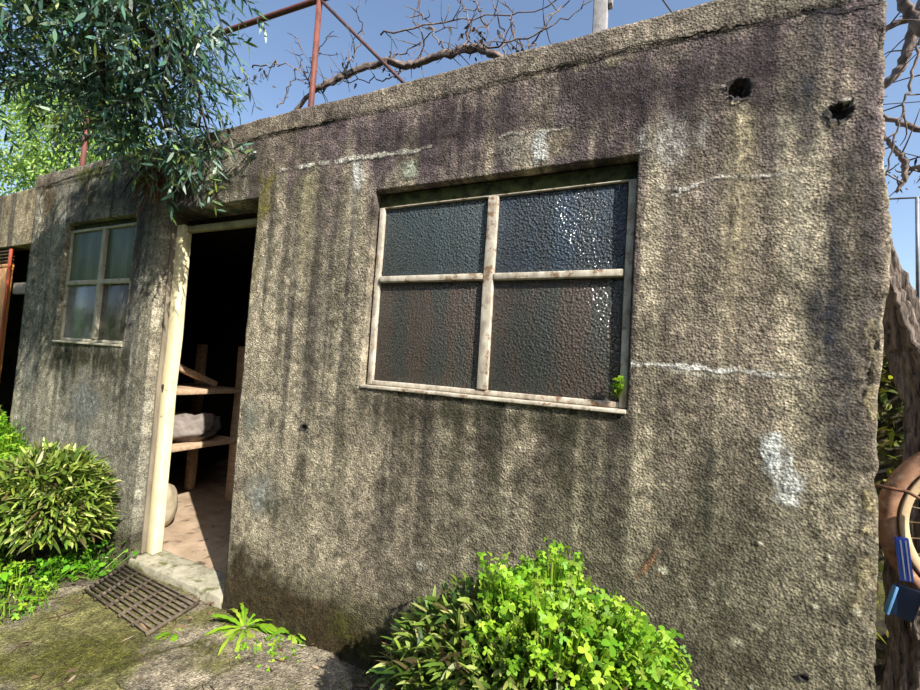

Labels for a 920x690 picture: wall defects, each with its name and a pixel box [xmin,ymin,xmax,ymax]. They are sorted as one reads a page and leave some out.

spalling [721,77,756,104]
spalling [824,97,857,126]
damp [402,160,417,178]
damp [631,361,784,378]
damp [761,432,805,507]